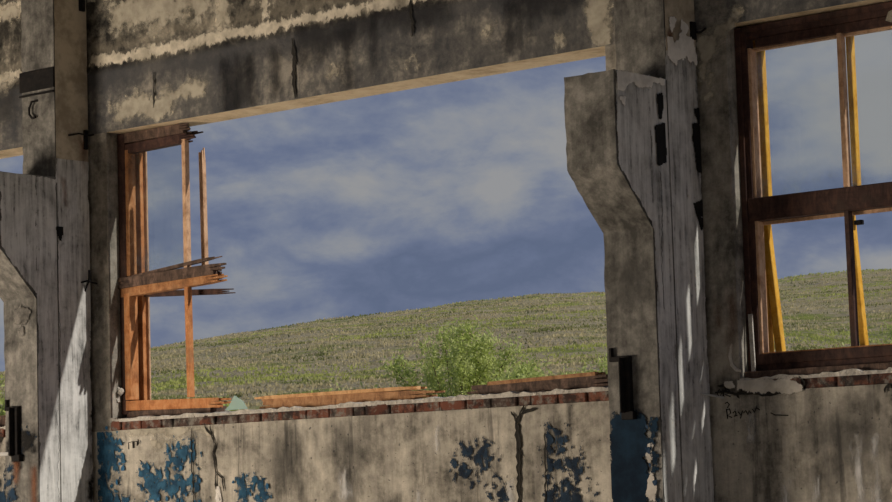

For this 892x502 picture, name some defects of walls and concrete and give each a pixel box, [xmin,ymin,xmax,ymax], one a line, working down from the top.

damp [585,0,614,46]
spalling [667,16,697,66]
spalling [617,70,667,166]
spalling [692,108,702,174]
spalling [723,344,803,394]
peeling [97,425,213,502]
peeling [232,472,272,502]
peeling [446,436,512,502]
crack [511,406,537,502]
crack [541,433,549,502]
peeling [538,419,599,502]
peeling [610,410,661,502]